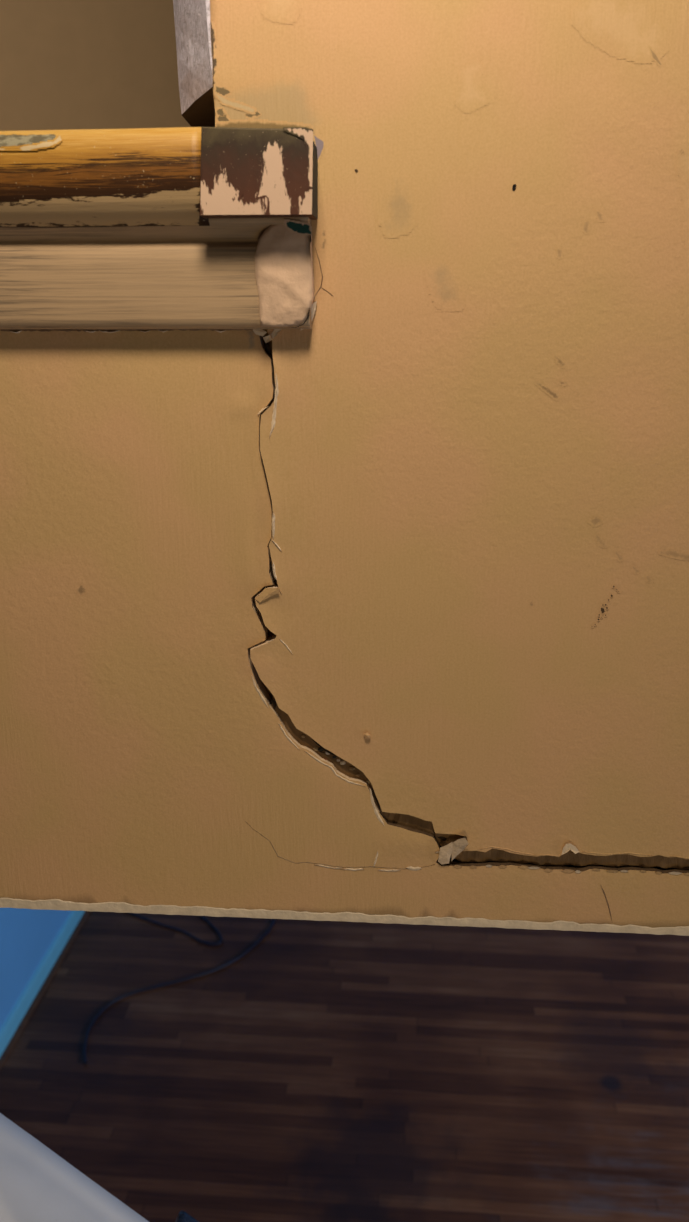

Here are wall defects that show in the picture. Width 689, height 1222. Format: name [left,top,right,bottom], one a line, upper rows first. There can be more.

peeling [0,127,325,227]
crack [248,235,689,920]